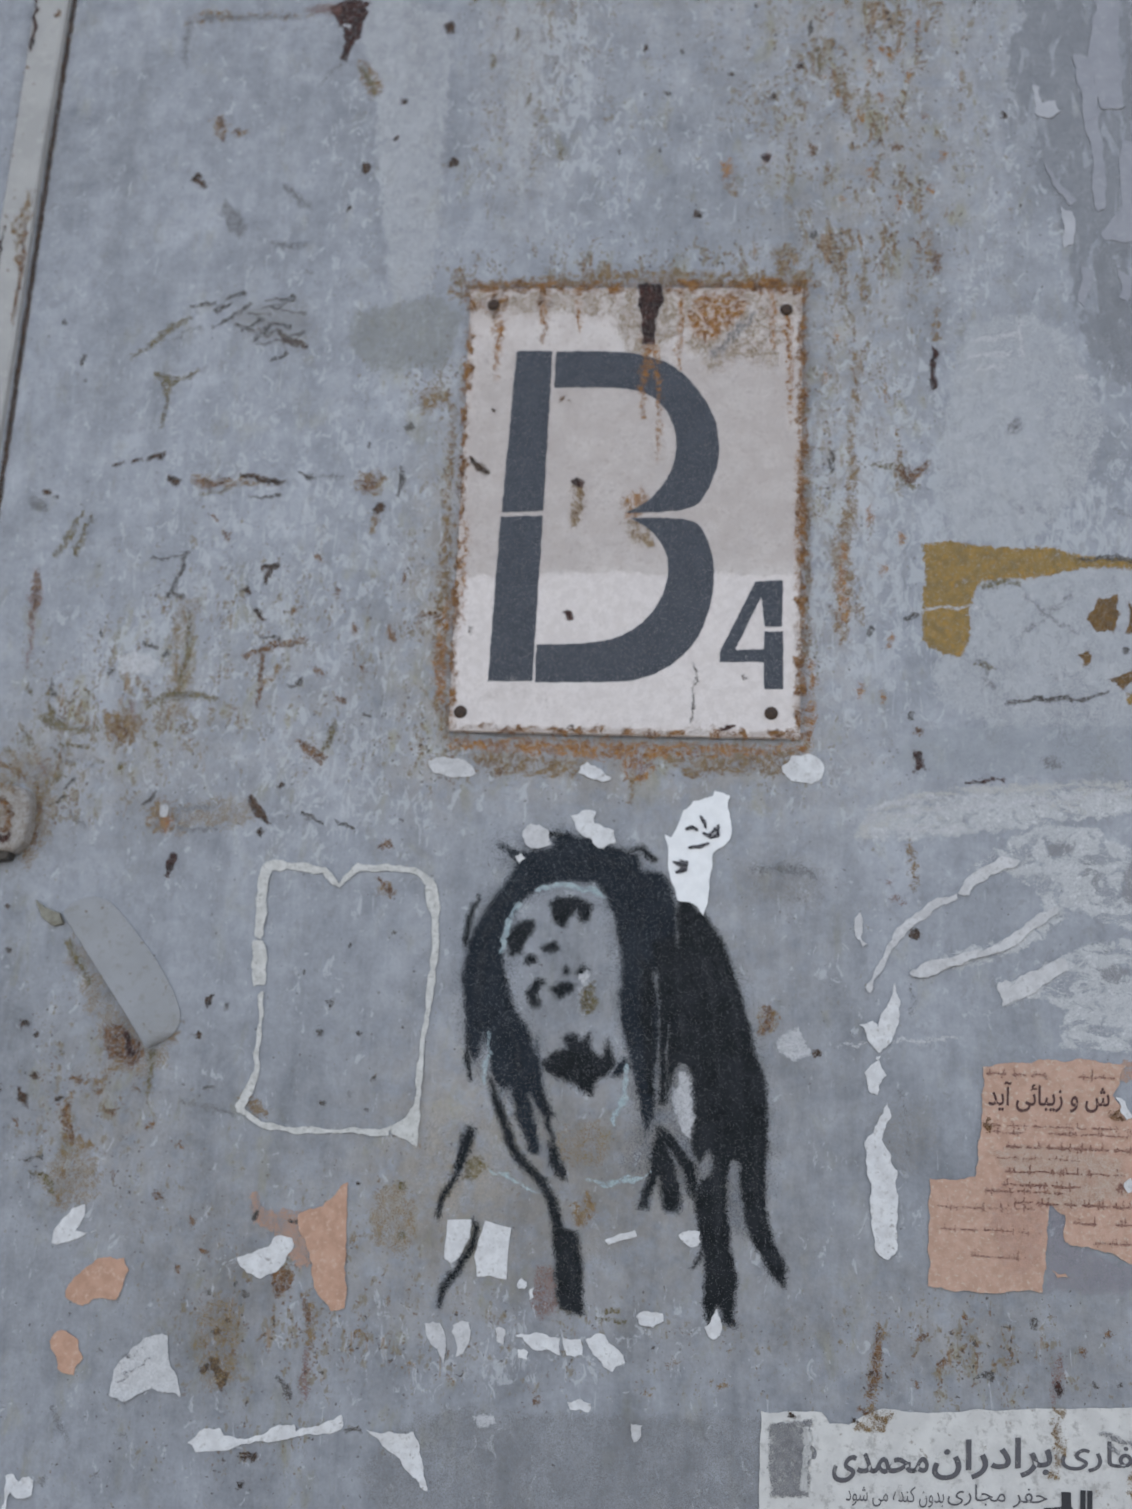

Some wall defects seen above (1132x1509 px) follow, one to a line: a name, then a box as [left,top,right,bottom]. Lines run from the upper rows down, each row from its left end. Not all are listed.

corrosion [303,0,385,101]
corrosion [795,0,849,97]
peeling [1005,0,1132,388]
corrosion [448,247,821,302]
corrosion [909,230,942,275]
corrosion [929,307,943,392]
corrosion [404,330,931,805]
spalling [0,1070,40,1109]
corrosion [22,931,184,1214]